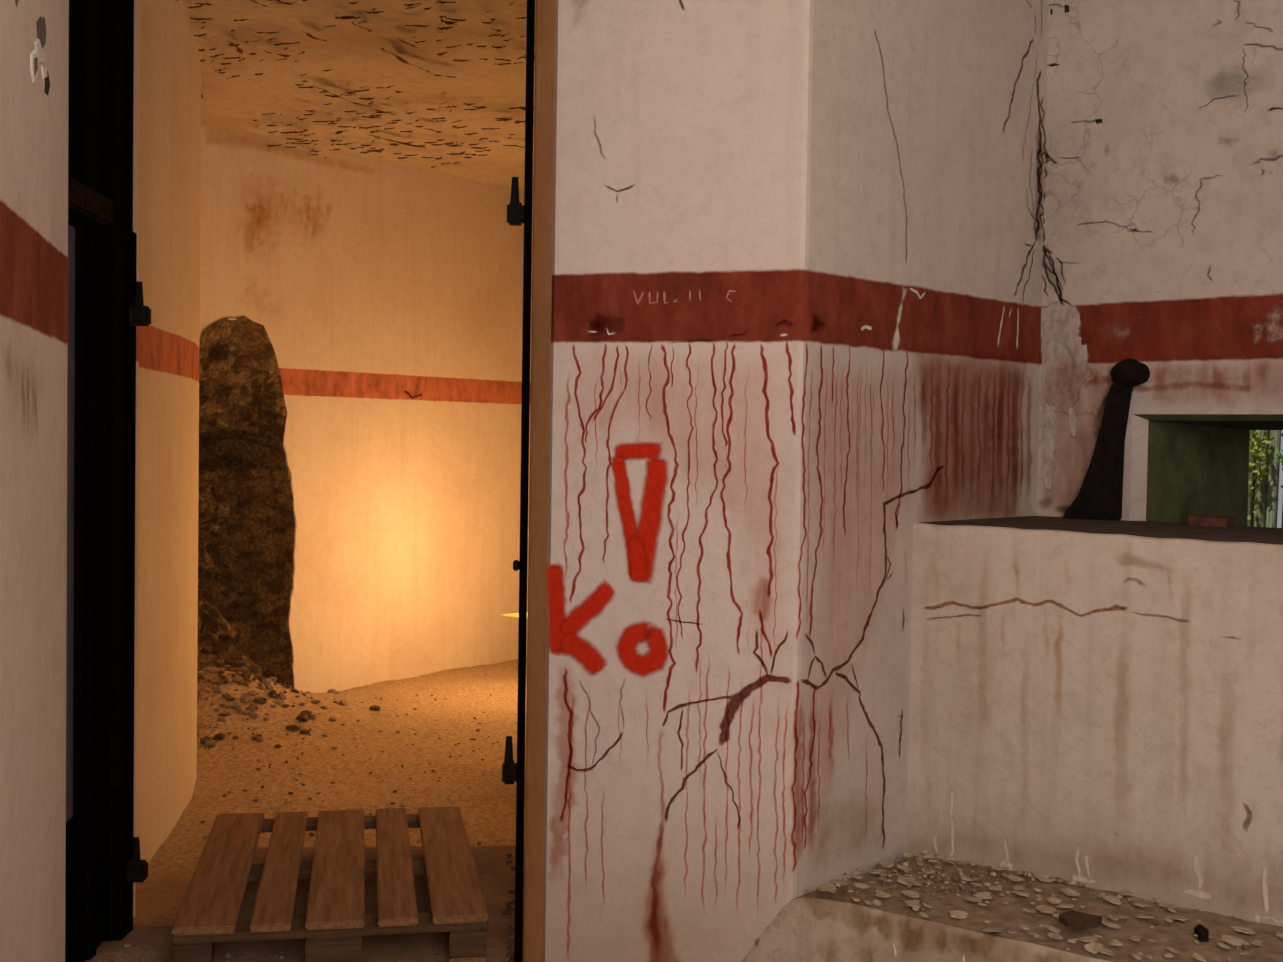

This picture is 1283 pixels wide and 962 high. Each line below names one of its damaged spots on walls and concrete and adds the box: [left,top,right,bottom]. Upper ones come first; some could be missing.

spalling [30,16,50,95]
crack [1003,40,1070,304]
corrosion [570,345,629,601]
corrosion [646,344,743,710]
corrosion [761,346,779,595]
corrosion [786,344,850,637]
peeling [893,288,925,349]
peeling [1039,300,1092,491]
peeling [1254,308,1283,342]
crack [663,466,943,846]
damp [1072,848,1098,884]
damp [1254,868,1283,924]